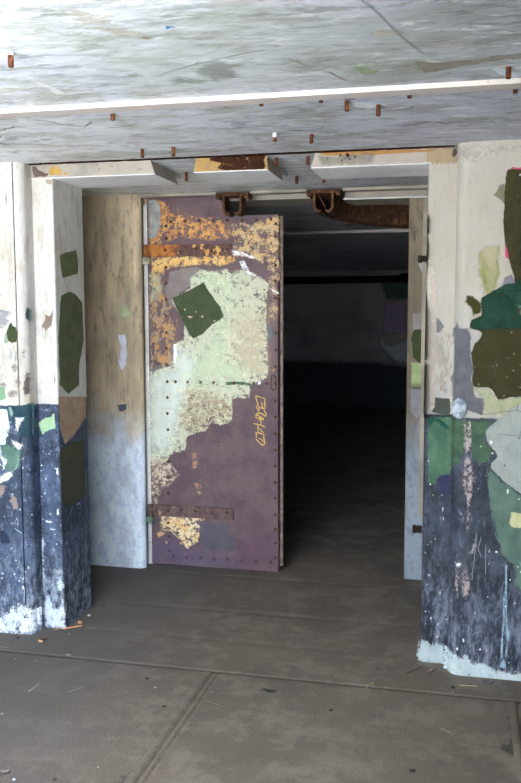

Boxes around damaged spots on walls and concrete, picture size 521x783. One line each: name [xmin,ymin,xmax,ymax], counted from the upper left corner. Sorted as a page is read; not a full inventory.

crack [361,0,423,54]
rust [28,145,458,177]
rust [148,199,280,369]
leakage [0,569,66,634]
leakage [416,565,521,681]